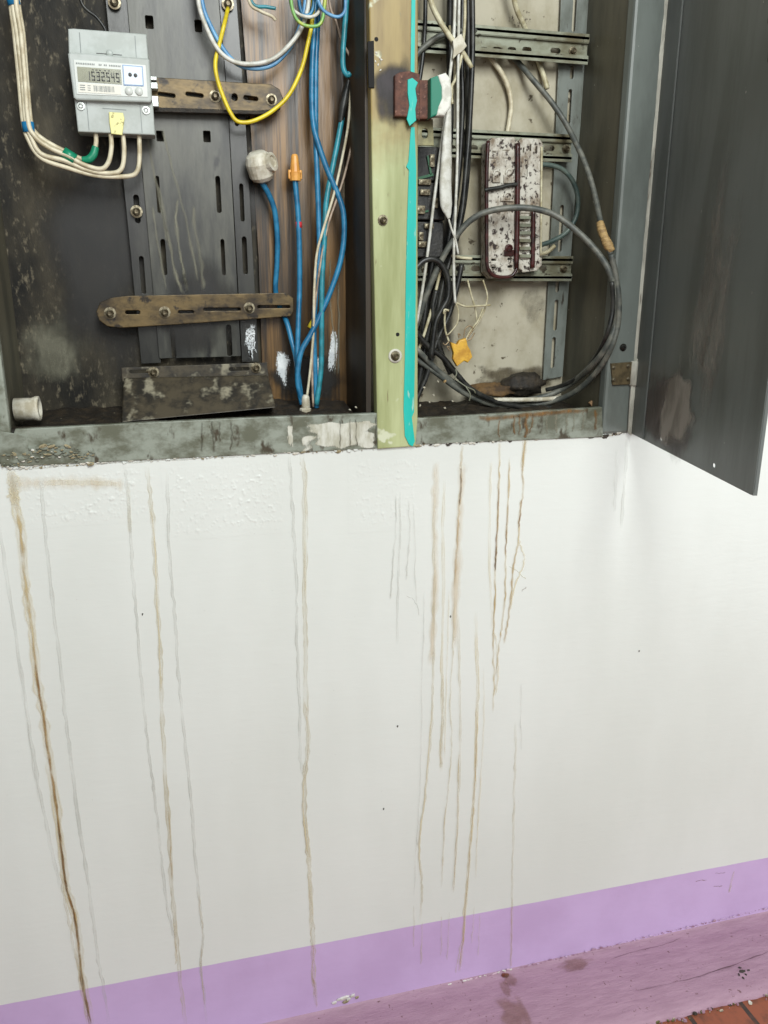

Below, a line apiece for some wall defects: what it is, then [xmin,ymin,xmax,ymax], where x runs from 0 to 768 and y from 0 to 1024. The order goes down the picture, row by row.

corrosion [487,410,572,613]
corrosion [23,572,79,946]